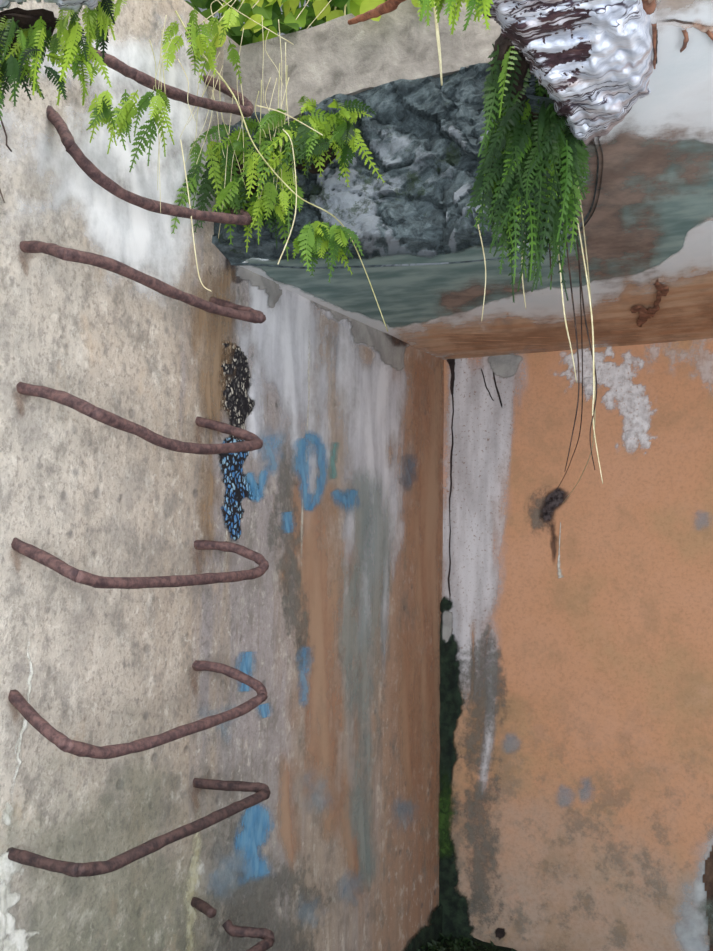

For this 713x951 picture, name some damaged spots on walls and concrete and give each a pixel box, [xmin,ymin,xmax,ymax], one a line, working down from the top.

peeling [226,258,282,308]
spalling [631,278,669,327]
corrosion [192,308,233,443]
leakage [240,130,713,888]
crack [14,643,33,781]
leakage [0,852,39,951]
leakage [676,840,713,951]